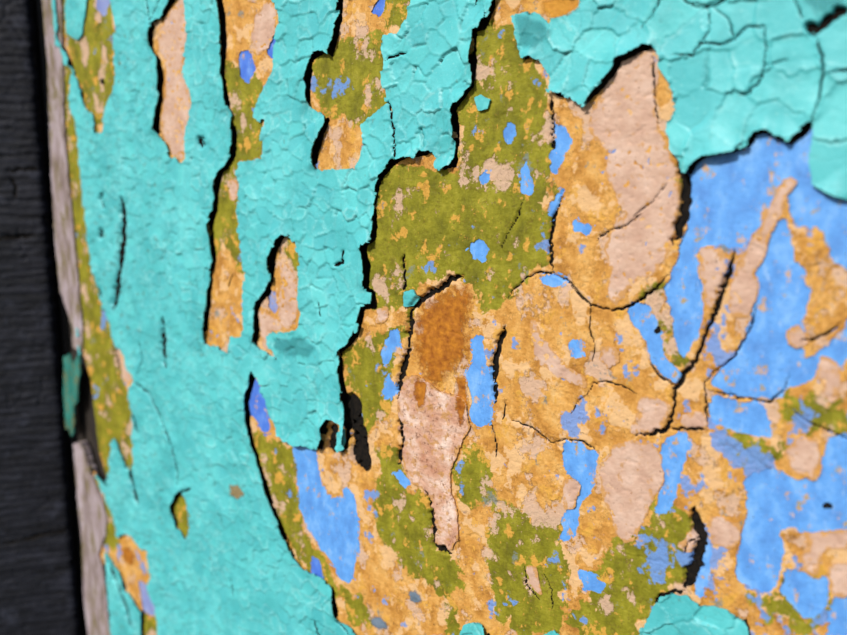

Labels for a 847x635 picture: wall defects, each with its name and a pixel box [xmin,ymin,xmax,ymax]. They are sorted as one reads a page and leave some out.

peeling [152,0,191,163]
crack [652,0,788,124]
crack [793,0,847,136]
peeling [63,0,157,635]
peeling [203,0,279,353]
crack [490,326,600,456]
peeling [249,0,847,635]
crack [508,195,671,361]
crack [597,162,692,245]
crack [636,250,846,438]
peeling [172,493,190,539]
crack [654,507,708,604]